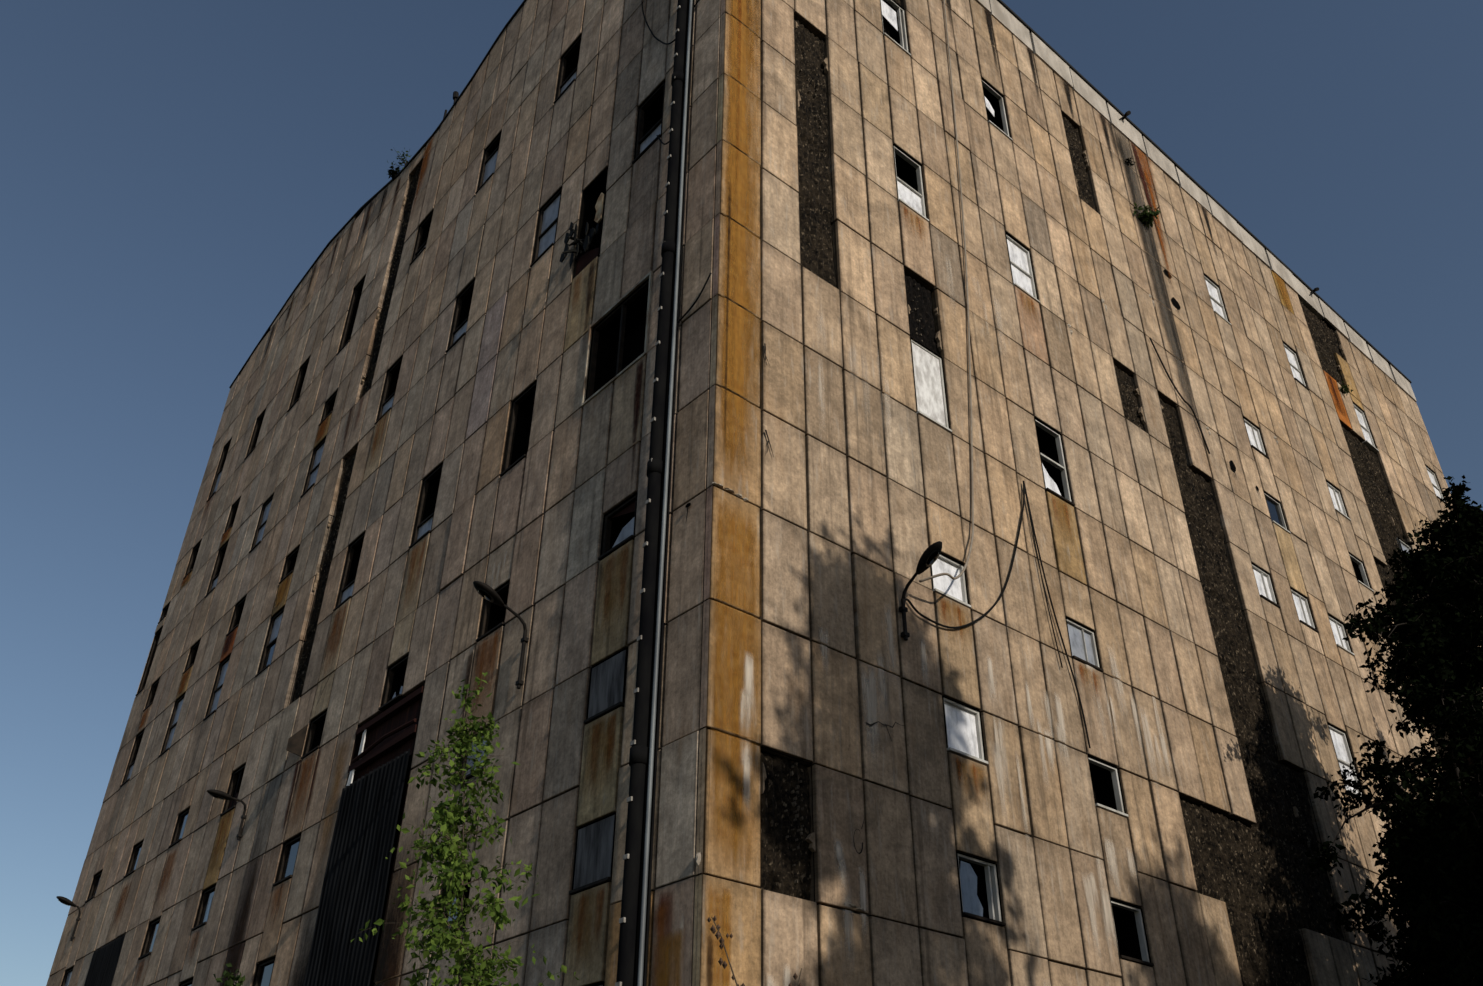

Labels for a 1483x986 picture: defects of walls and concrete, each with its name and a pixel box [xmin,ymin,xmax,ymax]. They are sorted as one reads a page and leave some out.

corrosion [723,0,758,460]
peeling [794,19,836,287]
corrosion [1132,144,1168,267]
corrosion [1327,374,1346,415]
peeling [1341,425,1426,606]
corrosion [715,511,758,851]
peeling [1114,365,1344,986]
corrosion [283,749,320,828]
peeling [759,751,816,901]
corrosion [657,894,681,986]